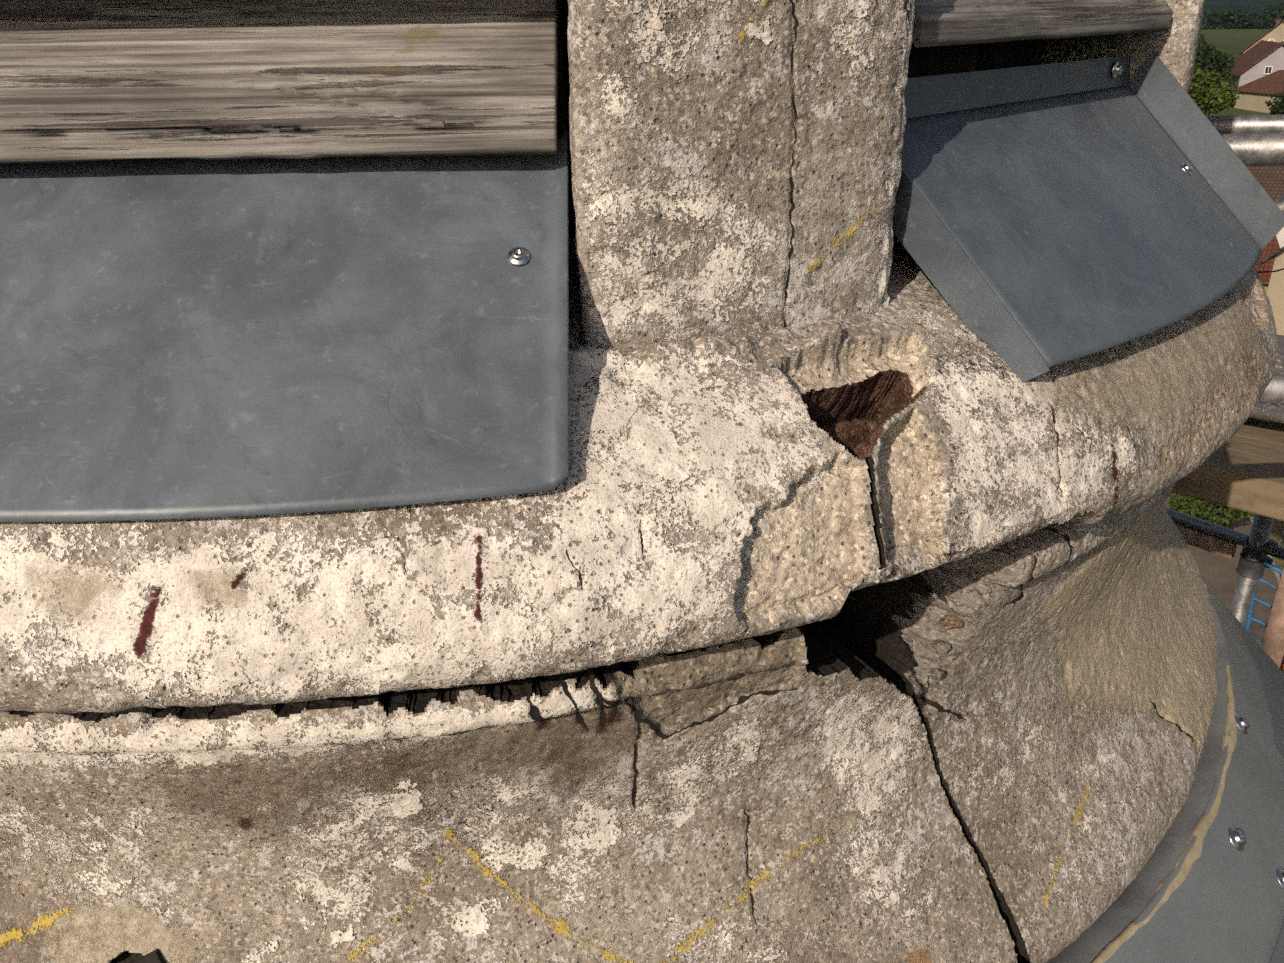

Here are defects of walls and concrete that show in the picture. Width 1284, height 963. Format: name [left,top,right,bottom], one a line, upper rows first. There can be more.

crack [783,0,798,327]
spalling [1239,274,1270,330]
spalling [1154,341,1263,478]
peeling [0,139,1142,963]
crack [566,549,582,589]
crack [865,456,887,577]
crack [523,668,797,811]
crack [744,806,756,924]
crack [878,666,1031,963]